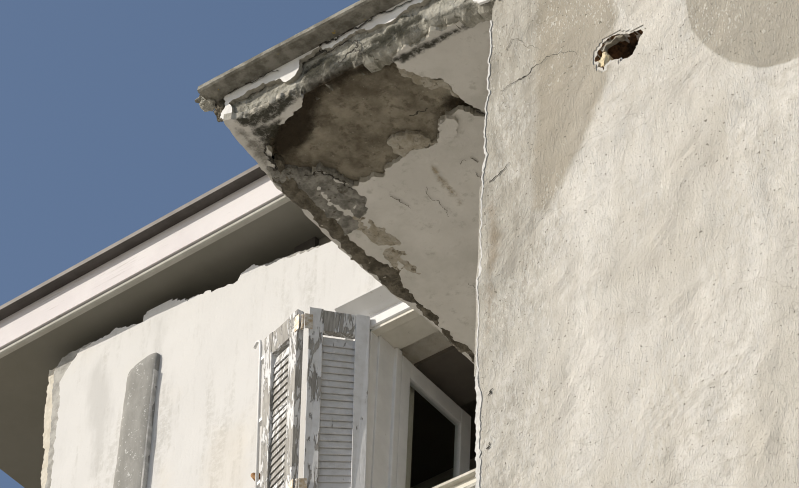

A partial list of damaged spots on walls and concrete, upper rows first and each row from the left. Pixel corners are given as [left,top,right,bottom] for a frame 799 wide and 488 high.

peeling [220,0,431,120]
spalling [266,20,492,488]
crack [503,38,577,91]
leakage [474,0,799,378]